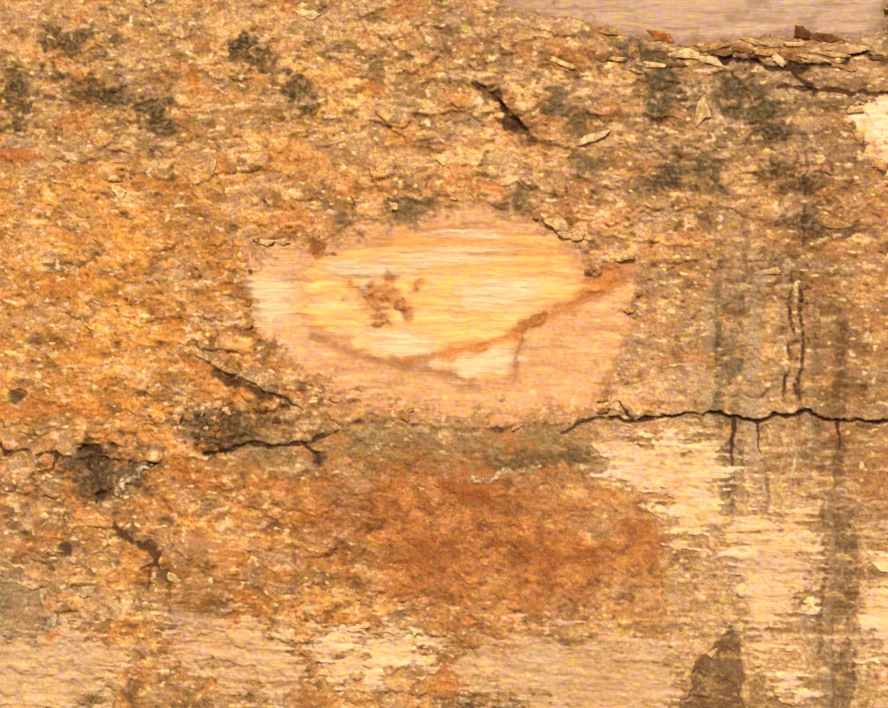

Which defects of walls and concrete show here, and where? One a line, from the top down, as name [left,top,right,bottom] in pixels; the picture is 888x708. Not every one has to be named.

peeling [495,0,888,73]
spalling [471,81,611,149]
peeling [694,94,711,127]
leakage [758,155,826,194]
peeling [843,89,888,188]
leakage [775,208,861,244]
spalling [194,196,645,431]
leakage [701,253,767,465]
leakage [775,264,821,399]
crack [202,423,329,465]
crack [560,400,888,477]
corrosion [297,444,664,630]